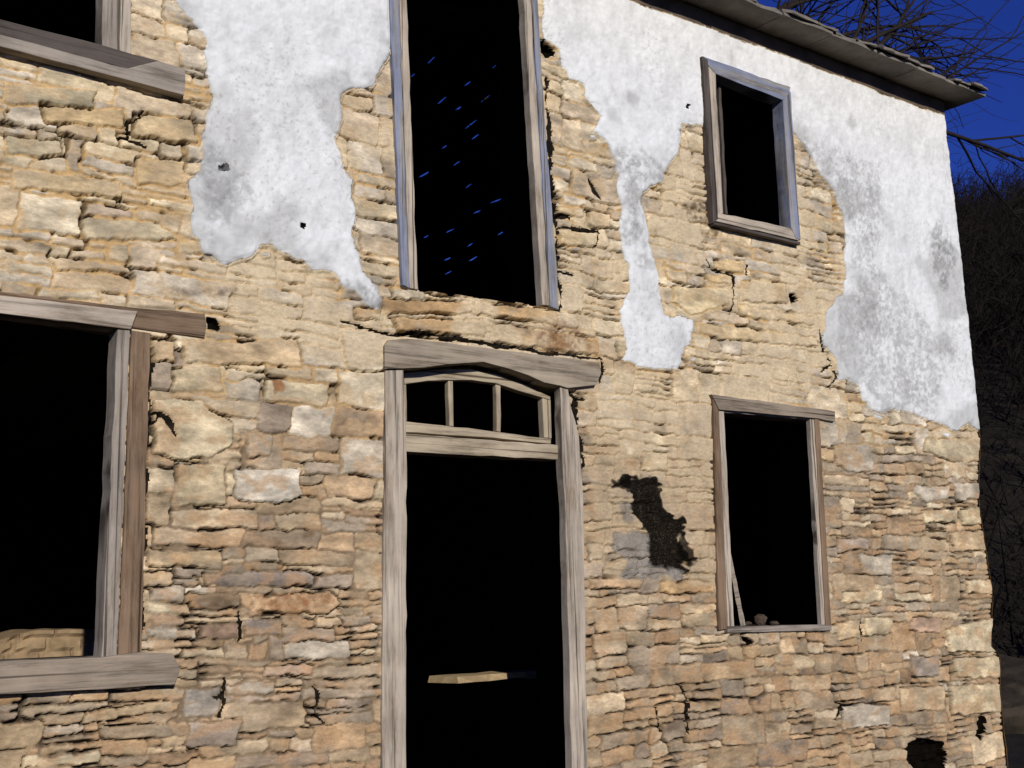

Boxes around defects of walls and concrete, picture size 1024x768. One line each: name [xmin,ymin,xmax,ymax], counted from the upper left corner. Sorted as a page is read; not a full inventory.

peeling [539,0,980,438]
crack [706,259,748,315]
crack [819,329,838,390]
crack [145,335,177,501]
crack [142,527,150,554]
leakage [611,502,683,581]
crack [140,583,148,633]
crack [212,678,226,718]
crack [310,686,325,723]